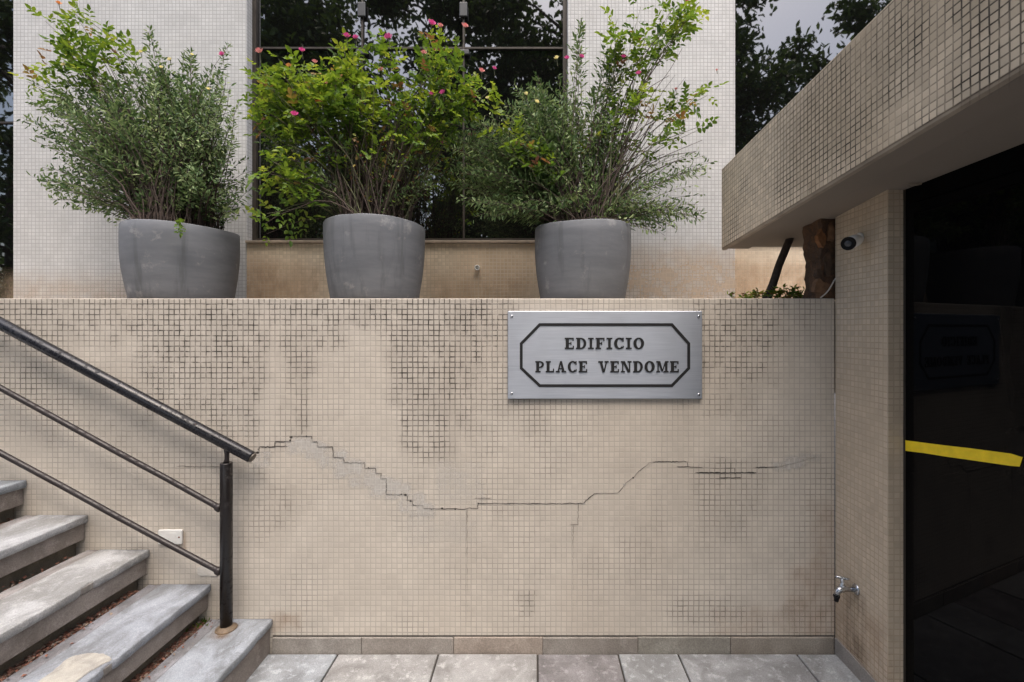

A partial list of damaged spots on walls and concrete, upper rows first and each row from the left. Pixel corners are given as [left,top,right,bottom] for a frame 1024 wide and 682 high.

water stain [0,299,74,345]
water stain [78,299,507,422]
crack [256,376,817,563]